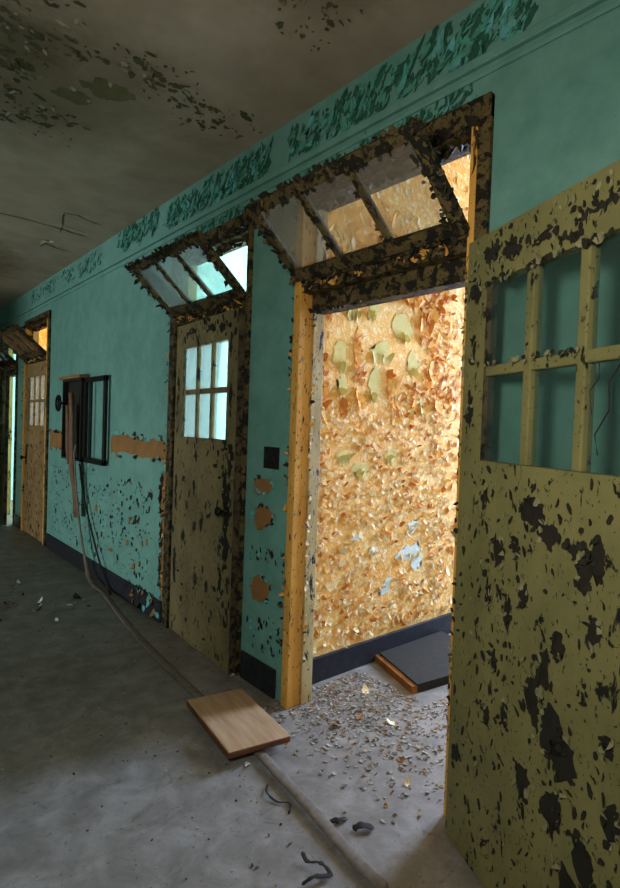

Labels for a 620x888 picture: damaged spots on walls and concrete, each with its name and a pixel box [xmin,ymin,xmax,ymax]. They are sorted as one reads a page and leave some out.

crack [0,212,100,252]
peeling [0,0,539,356]
spalling [48,429,62,451]
spalling [51,431,187,621]
peeling [201,441,234,628]
spalling [246,546,285,657]
spalling [250,474,287,531]
peeling [301,169,620,888]